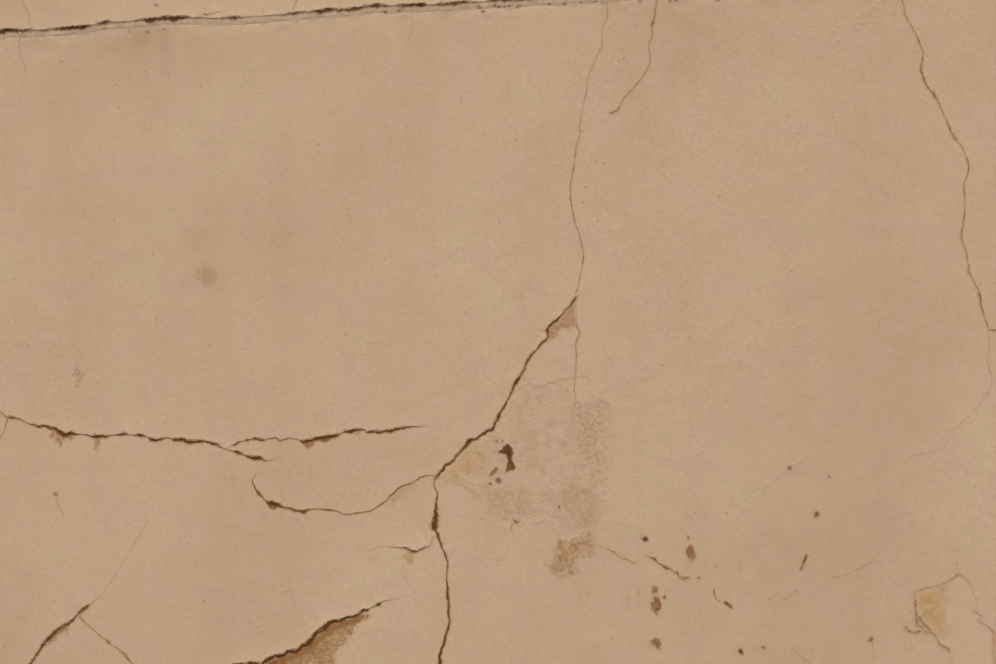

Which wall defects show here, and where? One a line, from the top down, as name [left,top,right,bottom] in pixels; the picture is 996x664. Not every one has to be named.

crack [608,0,679,115]
crack [0,0,609,664]
crack [900,0,996,462]
peeling [432,366,621,579]
crack [598,544,733,610]